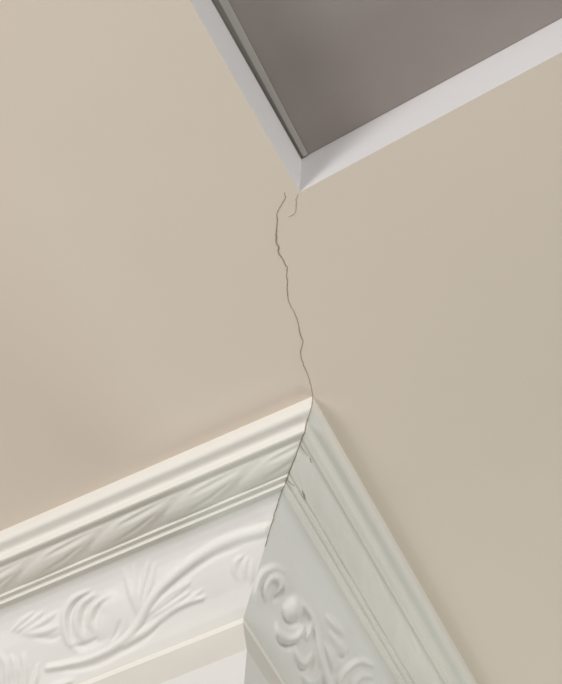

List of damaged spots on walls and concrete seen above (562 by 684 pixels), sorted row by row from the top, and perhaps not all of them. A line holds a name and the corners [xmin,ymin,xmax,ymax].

crack [265,193,313,546]